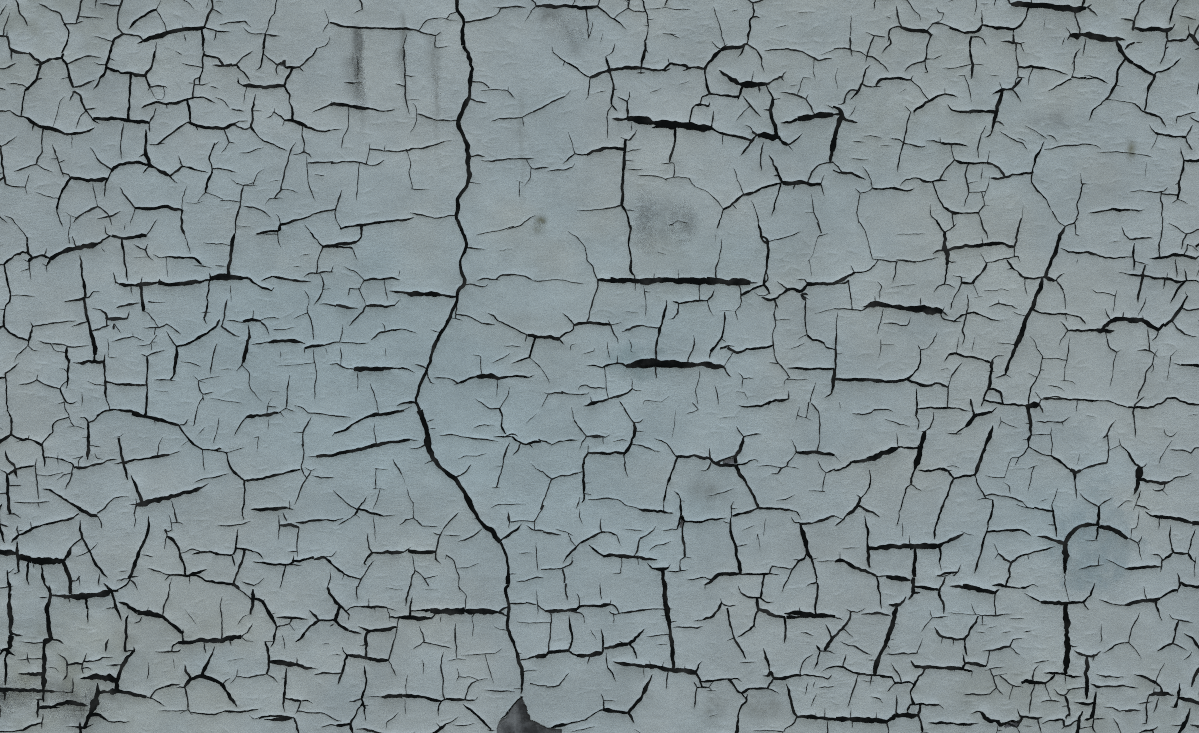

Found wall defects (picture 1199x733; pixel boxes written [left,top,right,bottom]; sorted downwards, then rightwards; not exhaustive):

spalling [497,696,562,733]
crack [251,0,1199,733]